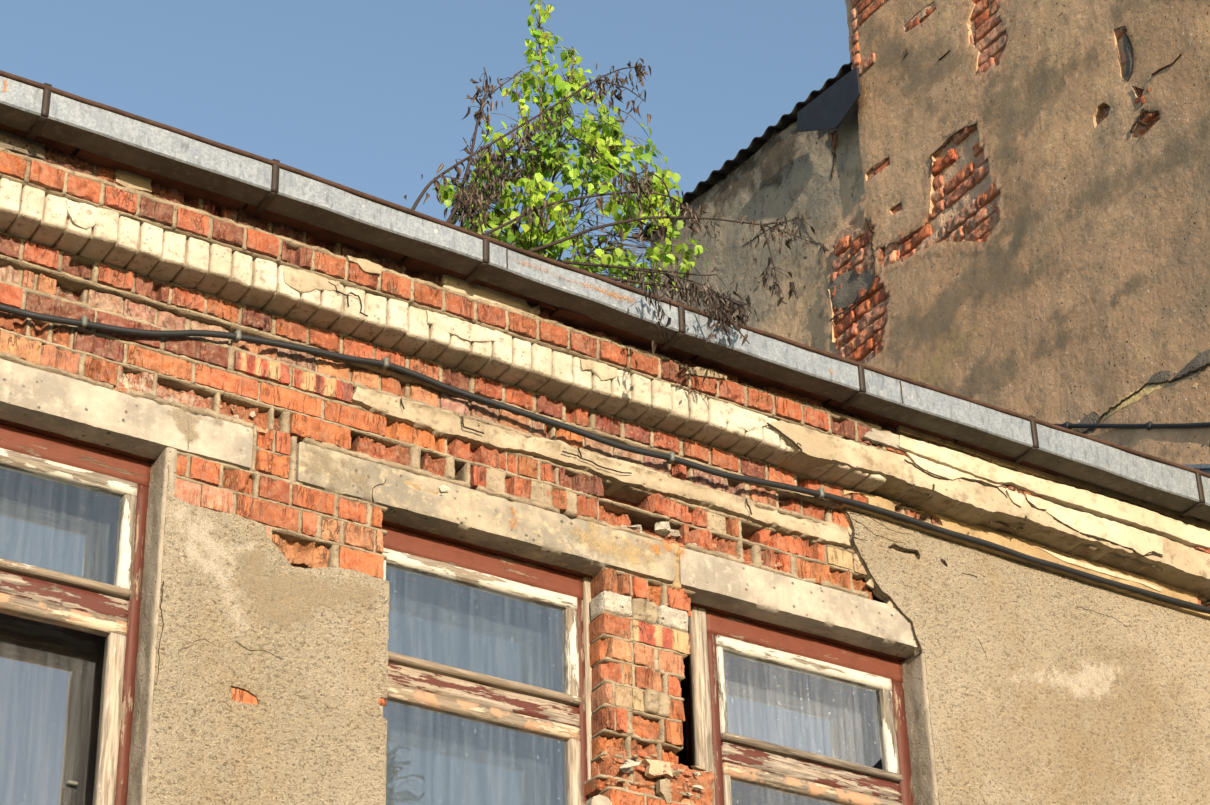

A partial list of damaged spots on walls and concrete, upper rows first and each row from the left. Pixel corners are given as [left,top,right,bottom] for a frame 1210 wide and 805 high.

spalling [845,0,885,77]
spalling [904,2,936,37]
spalling [950,0,1016,86]
spalling [1114,26,1161,140]
spalling [819,103,1011,367]
crack [328,281,368,317]
spalling [1072,349,1210,434]
spalling [600,518,782,571]
crack [851,513,908,543]
crack [904,459,1163,557]
spalling [597,747,715,805]